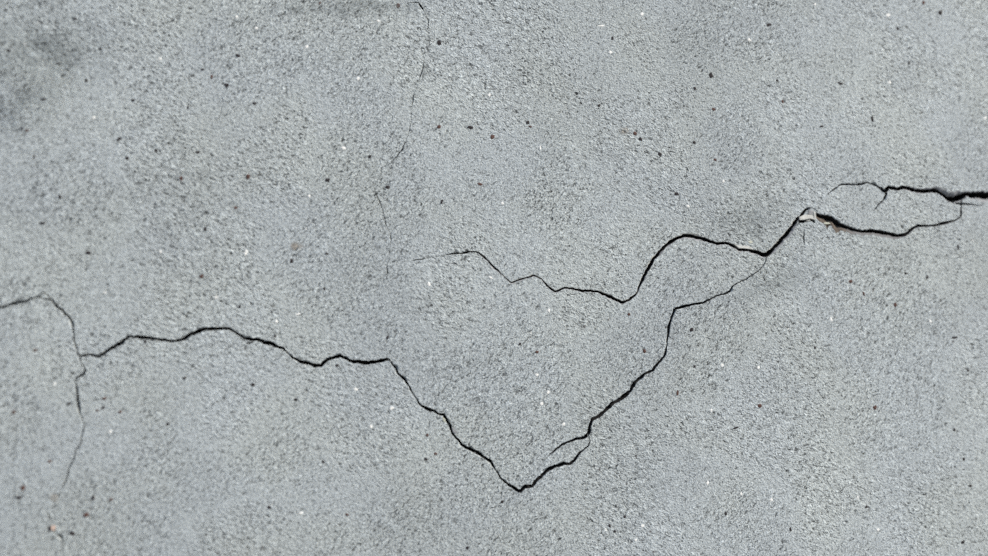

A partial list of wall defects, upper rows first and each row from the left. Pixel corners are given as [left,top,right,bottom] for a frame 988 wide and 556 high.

crack [408,1,429,31]
crack [374,55,425,281]
crack [0,181,988,552]